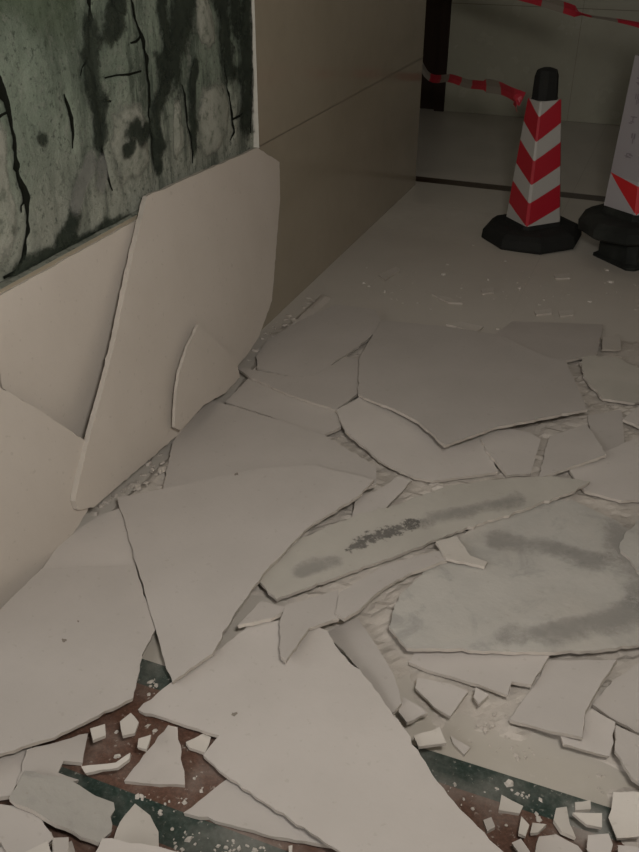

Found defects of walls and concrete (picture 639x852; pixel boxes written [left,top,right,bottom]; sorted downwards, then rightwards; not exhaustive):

crack [0,75,31,283]
crack [64,94,74,148]
damp [11,0,130,278]
spalling [0,0,254,282]
crack [104,0,153,159]
damp [123,0,199,174]
damp [213,0,254,135]
crack [226,77,251,141]
spalling [0,713,211,852]
spalling [328,618,489,725]
peeling [414,727,470,757]
spalling [509,660,639,852]